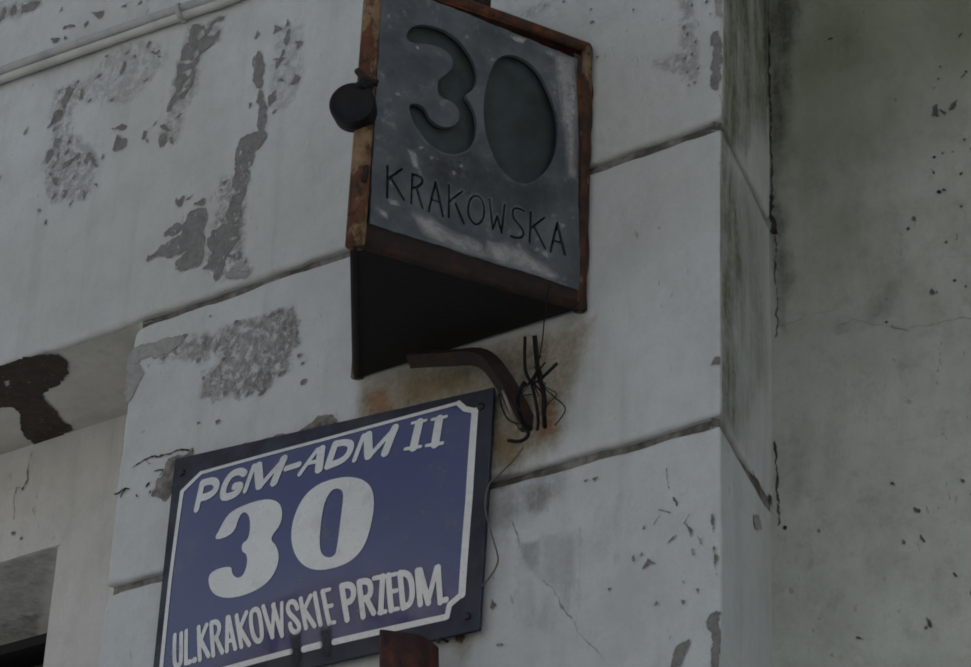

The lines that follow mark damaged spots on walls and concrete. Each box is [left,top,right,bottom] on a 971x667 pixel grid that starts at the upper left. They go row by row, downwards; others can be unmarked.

peeling [0,0,41,21]
peeling [45,79,127,206]
peeling [141,15,302,281]
crack [768,26,779,337]
peeling [0,354,73,445]
peeling [123,333,187,403]
spalling [299,414,338,431]
spalling [151,448,193,501]
crack [773,441,781,526]
peeling [671,639,690,667]
spalling [706,610,722,667]